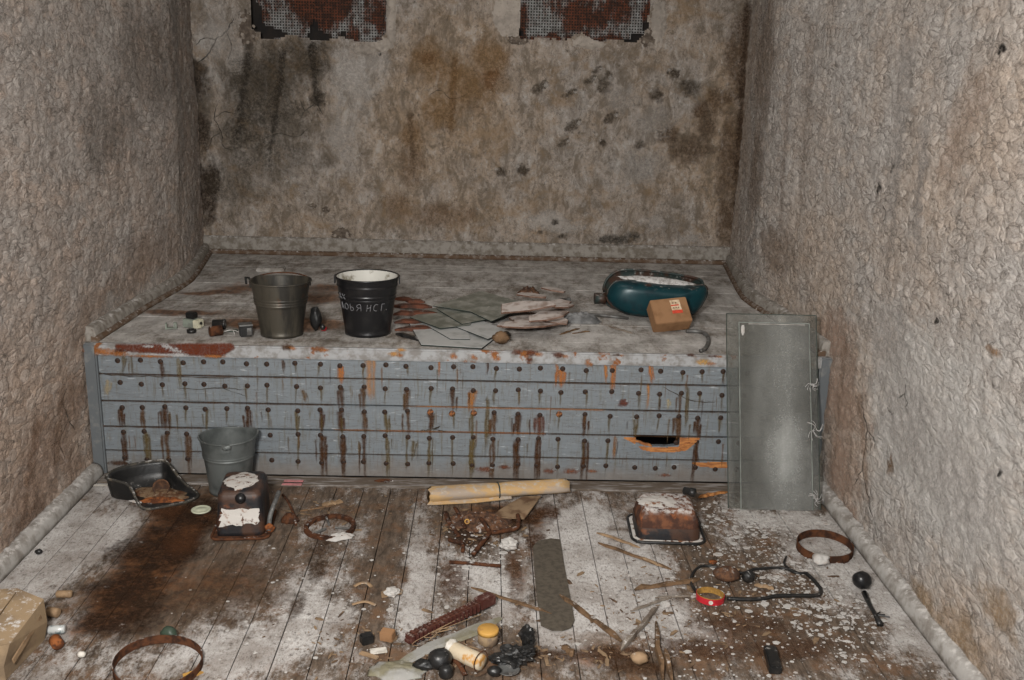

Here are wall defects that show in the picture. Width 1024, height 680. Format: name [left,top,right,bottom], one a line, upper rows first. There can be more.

damp [200,41,326,223]
damp [659,5,750,188]
corrosion [94,343,234,465]
corrosion [242,344,724,483]
spalling [624,437,700,452]
damp [76,497,218,636]